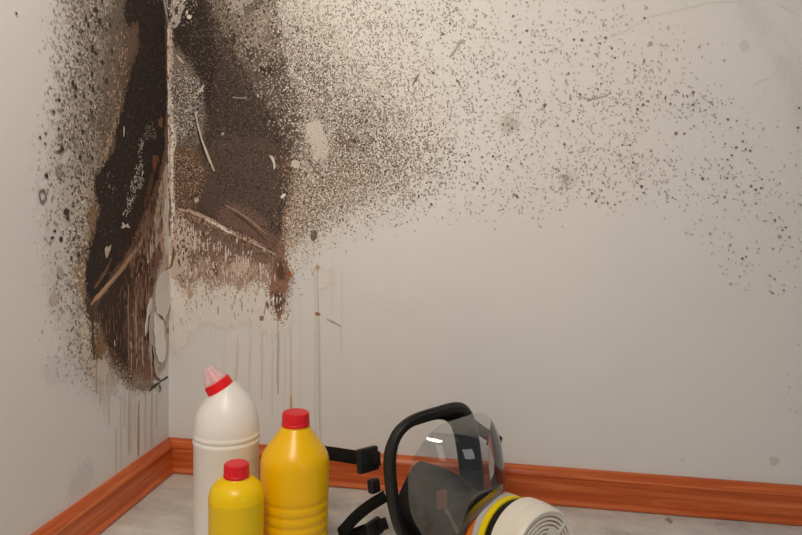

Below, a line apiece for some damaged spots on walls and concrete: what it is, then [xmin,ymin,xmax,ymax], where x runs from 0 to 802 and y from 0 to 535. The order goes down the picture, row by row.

spalling [145,28,213,377]
leakage [24,0,734,471]
leakage [685,214,760,291]
leakage [714,154,764,217]